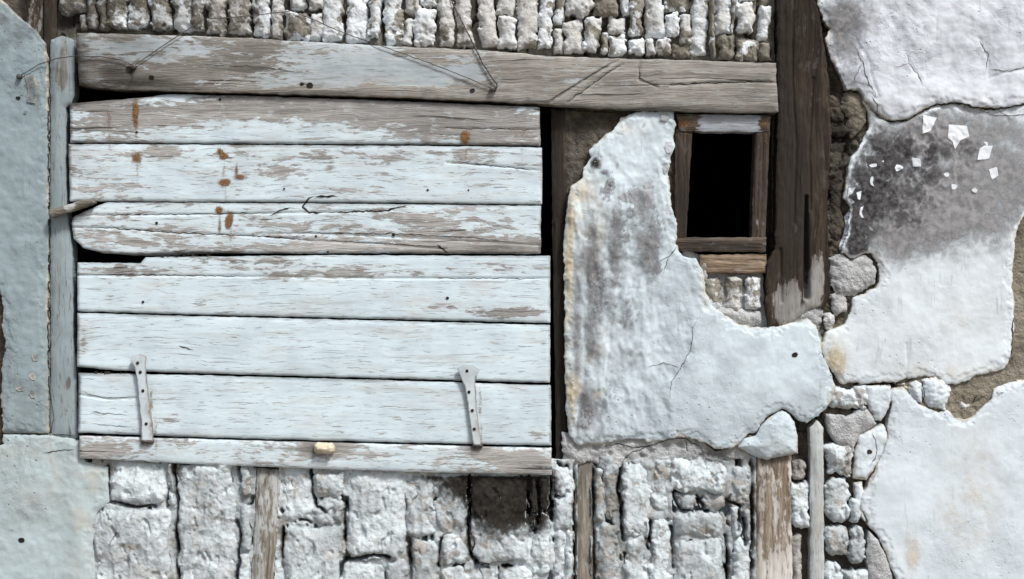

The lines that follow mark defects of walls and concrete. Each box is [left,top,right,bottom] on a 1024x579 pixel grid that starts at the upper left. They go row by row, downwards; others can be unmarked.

crack [852,43,1024,123]
peeling [922,115,936,134]
peeling [948,125,969,149]
corrosion [217,148,247,186]
flaking render [794,16,921,342]
peeling [978,142,998,179]
corrosion [215,206,233,238]
flaking render [681,252,778,327]
flaking render [821,217,1024,579]